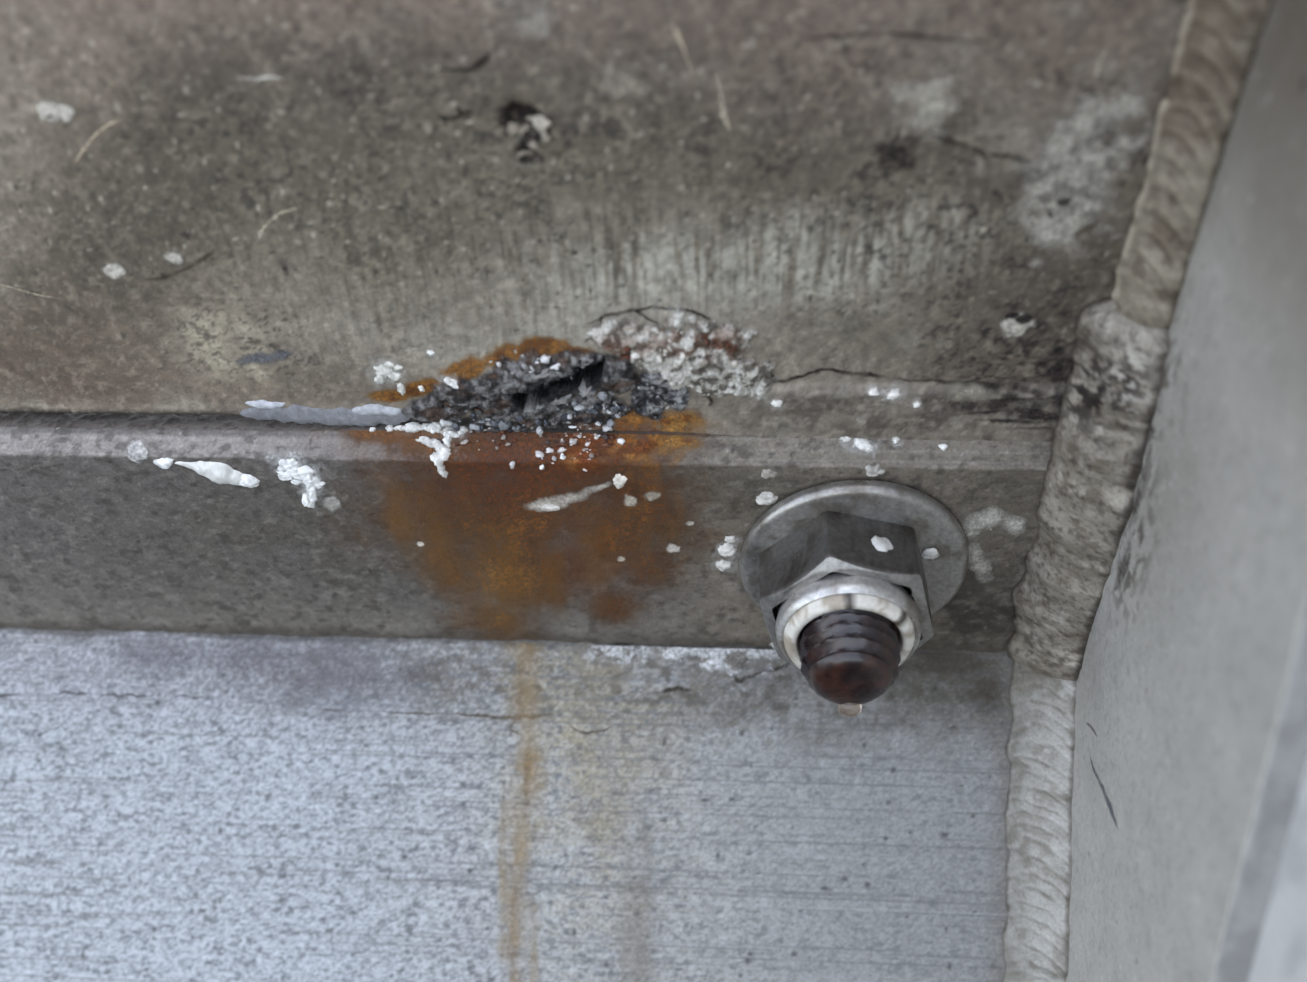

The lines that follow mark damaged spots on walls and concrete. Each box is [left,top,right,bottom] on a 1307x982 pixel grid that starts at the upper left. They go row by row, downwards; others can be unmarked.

crack [585,306,726,342]
peeling [373,361,425,396]
peeling [444,376,459,389]
rust [349,310,775,639]